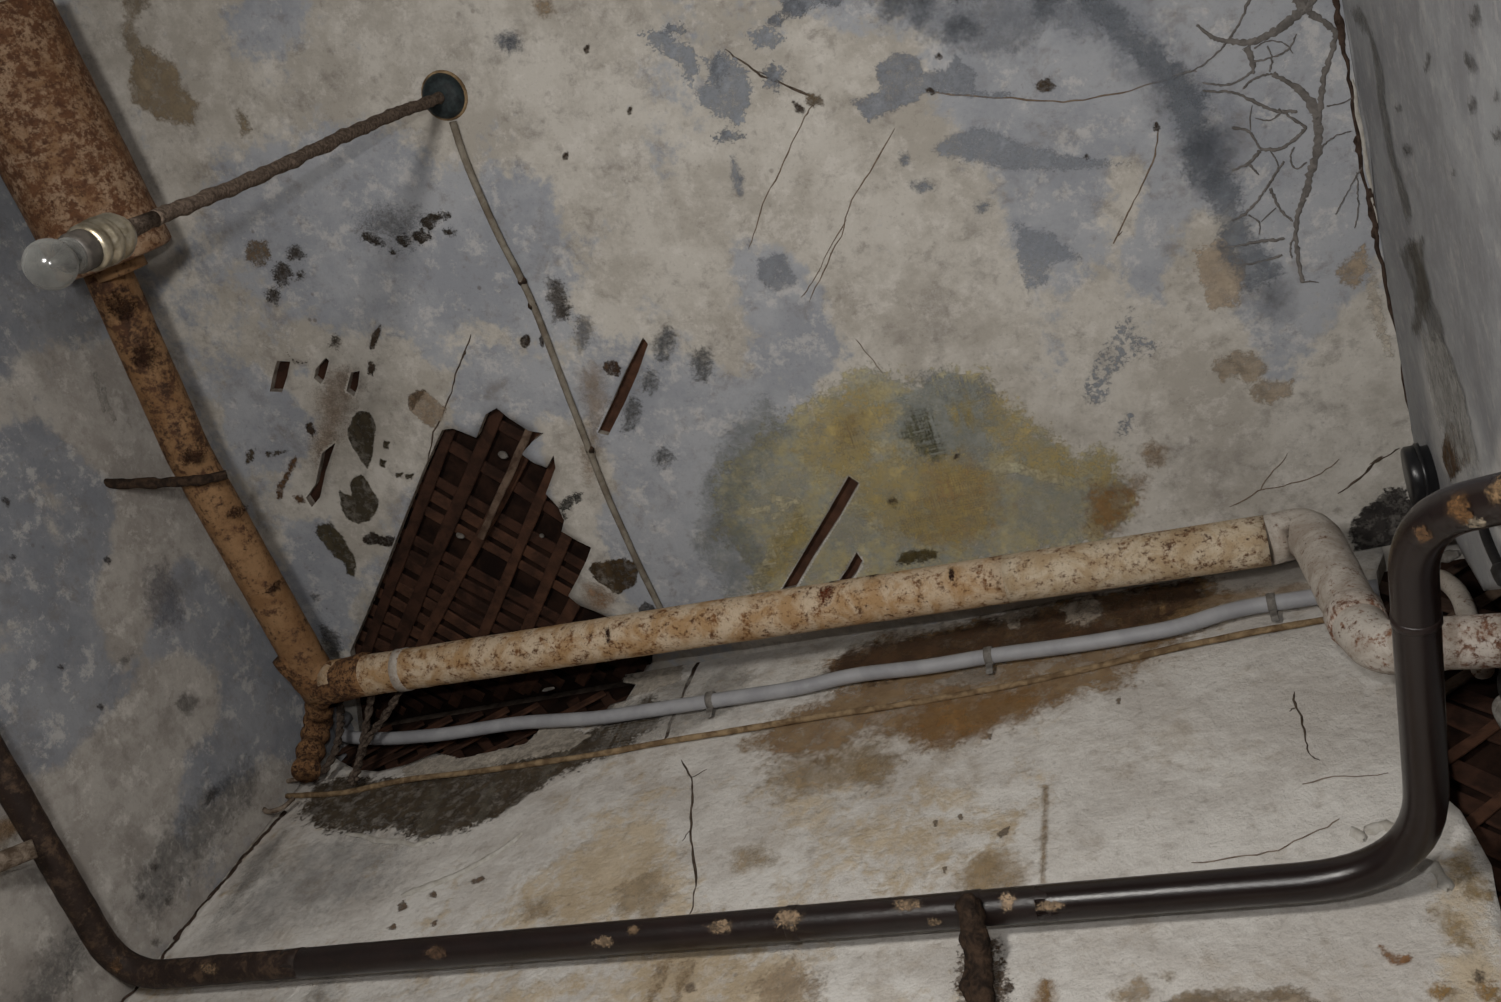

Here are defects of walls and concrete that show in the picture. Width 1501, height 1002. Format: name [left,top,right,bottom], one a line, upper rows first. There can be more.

crack [1230,0,1412,507]
flaking render [305,372,414,576]
flaking render [367,325,381,376]
flaking render [408,390,446,428]
leakage [711,366,1140,592]
leakage [1401,238,1476,469]
flaking render [588,558,638,607]
leakage [295,665,684,843]
crack [664,662,707,914]
crack [1191,818,1340,863]
crack [1289,692,1387,785]
leakage [1169,977,1319,1002]